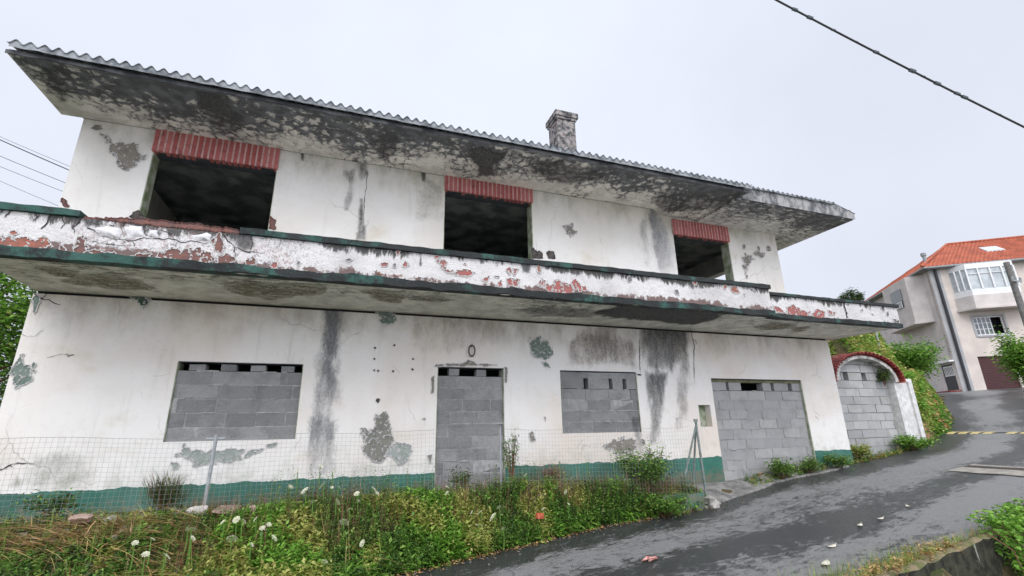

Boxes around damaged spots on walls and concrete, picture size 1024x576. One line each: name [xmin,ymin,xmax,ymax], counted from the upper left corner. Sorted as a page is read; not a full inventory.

flaking render [91,124,147,172]
leakage [470,148,503,176]
leakage [533,159,605,183]
peeling [0,230,117,254]
peeling [132,232,278,269]
leakage [229,233,252,249]
peeling [531,247,588,293]
leakage [650,192,739,251]
leakage [312,311,340,455]
leakage [523,305,724,427]
peeling [360,398,413,466]
peeling [170,442,277,470]